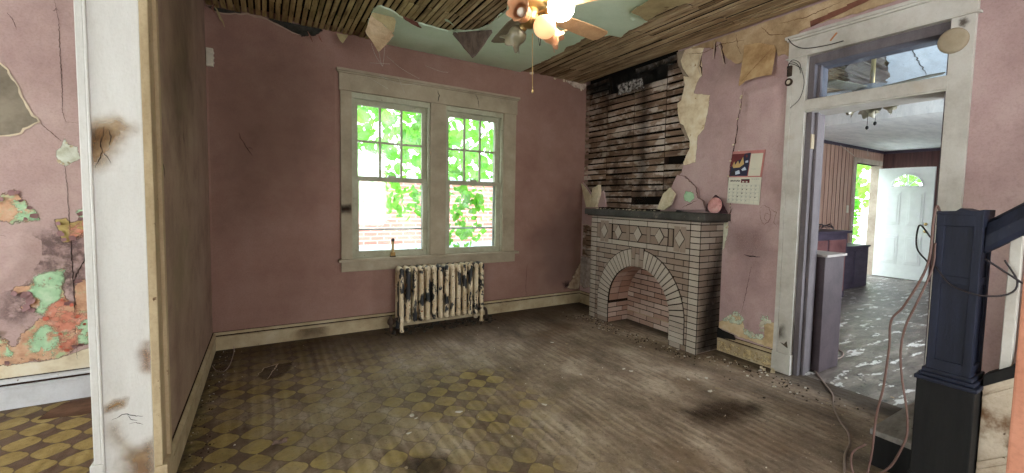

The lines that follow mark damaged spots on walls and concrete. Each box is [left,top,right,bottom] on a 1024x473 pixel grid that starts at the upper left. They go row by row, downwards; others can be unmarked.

flaking render [208,6,323,37]
flaking render [368,5,585,74]
flaking render [0,63,40,137]
flaking render [554,0,896,210]
crack [41,3,85,356]
peeling [56,139,80,166]
crack [96,127,112,165]
peeling [0,189,40,225]
peeling [54,209,84,243]
peeling [0,268,90,379]
peeling [717,311,774,365]